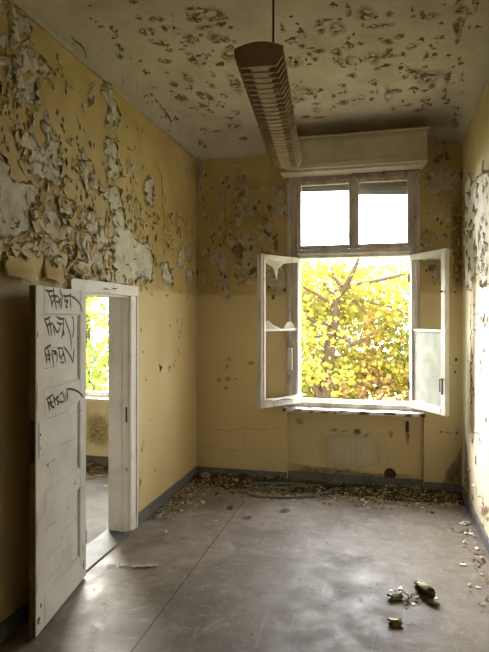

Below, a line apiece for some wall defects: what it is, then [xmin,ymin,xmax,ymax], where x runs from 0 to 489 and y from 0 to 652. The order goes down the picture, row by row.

peeling [280,15,323,67]
peeling [314,2,392,34]
peeling [442,0,482,43]
peeling [290,33,465,124]
peeling [0,0,289,300]
peeling [419,140,489,297]
peeling [473,304,488,333]